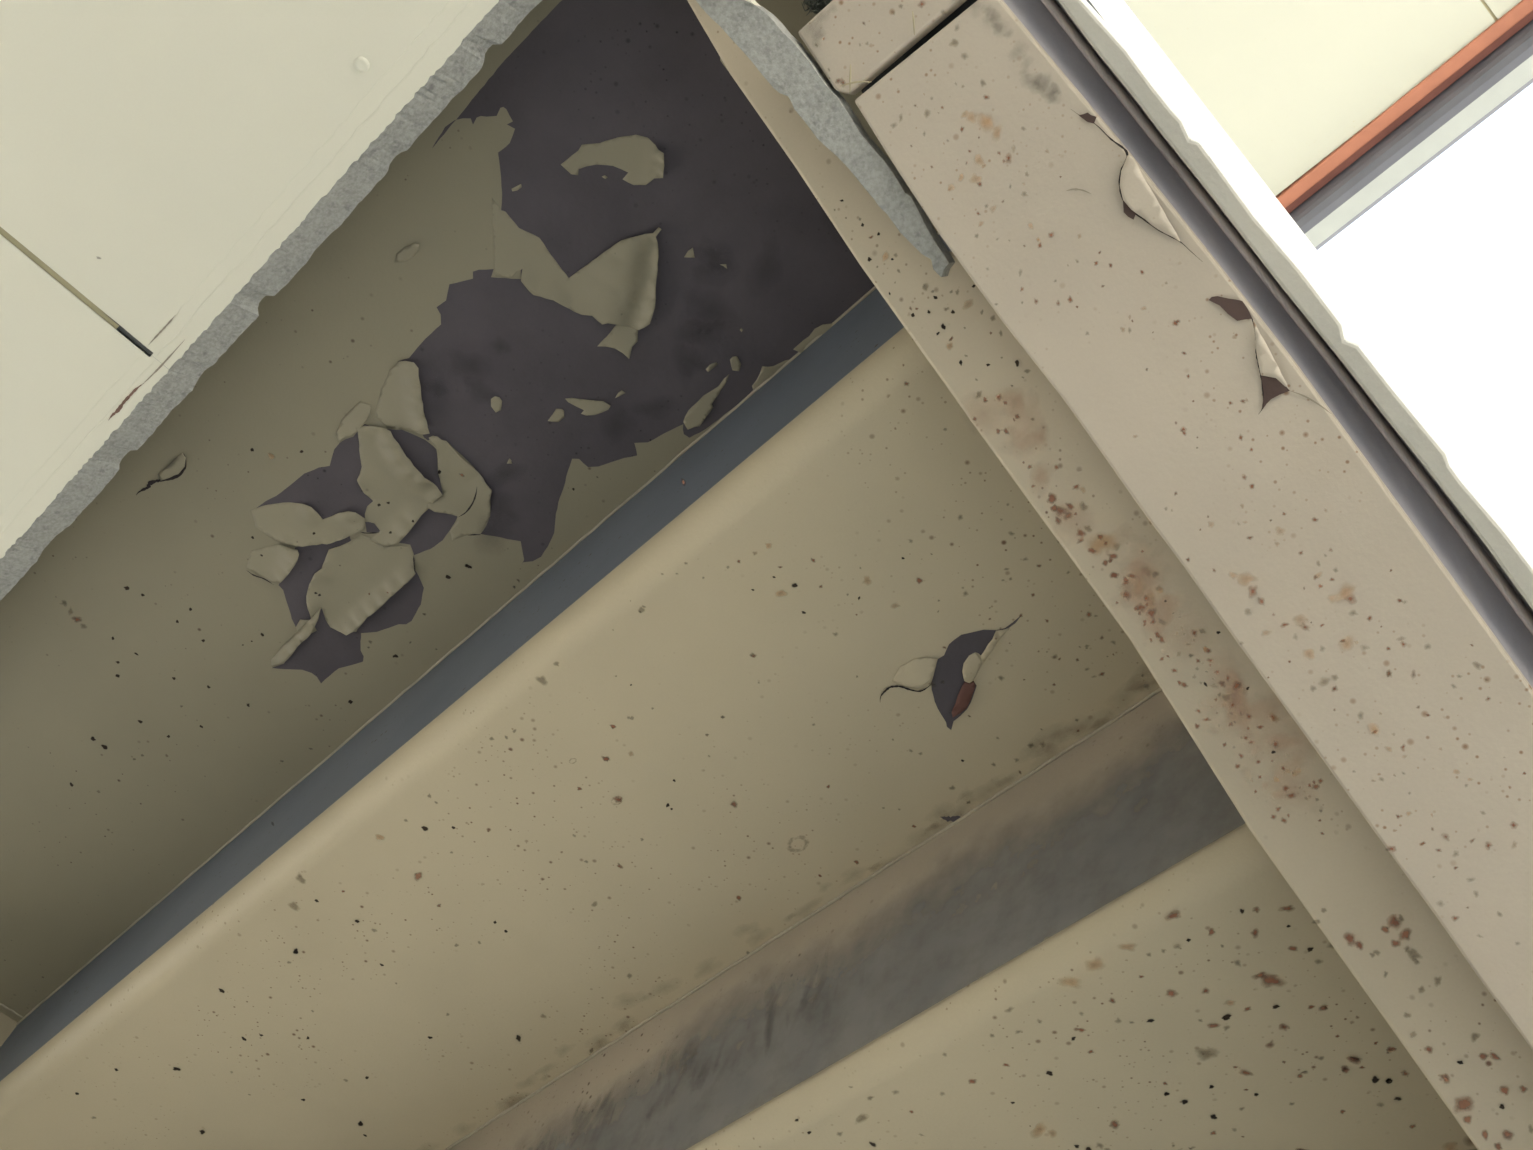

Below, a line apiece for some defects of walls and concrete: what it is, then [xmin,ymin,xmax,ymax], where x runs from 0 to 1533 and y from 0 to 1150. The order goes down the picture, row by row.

peeling [0,0,955,683]
rust [1023,461,1322,823]
peeling [880,617,1020,730]
rust [1382,916,1410,946]
rust [1256,973,1280,984]
rust [1343,1057,1408,1101]
rust [1457,1099,1512,1150]